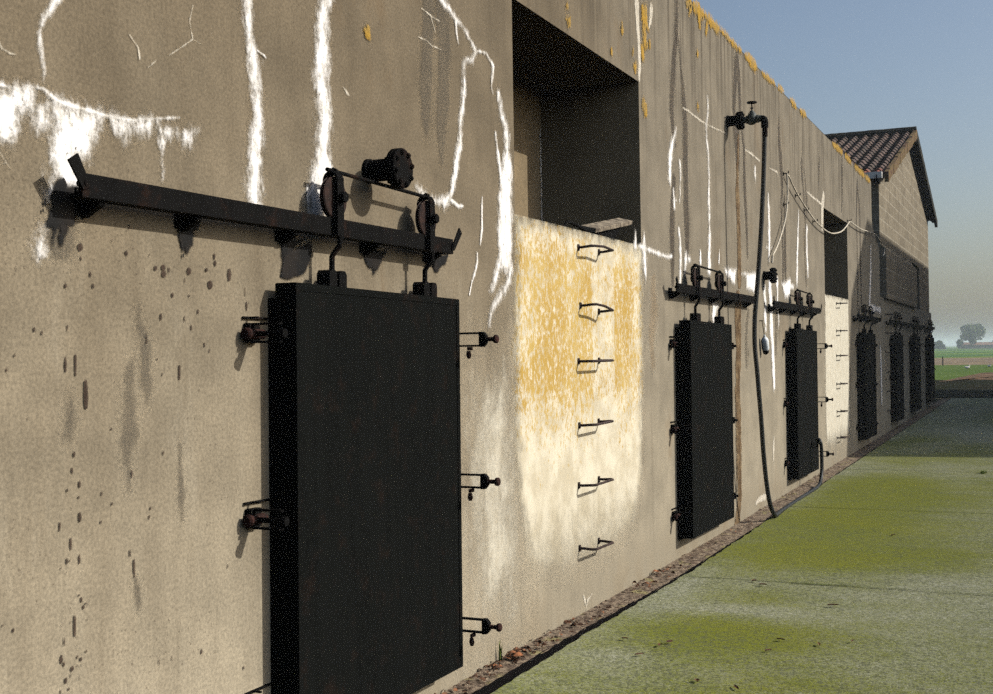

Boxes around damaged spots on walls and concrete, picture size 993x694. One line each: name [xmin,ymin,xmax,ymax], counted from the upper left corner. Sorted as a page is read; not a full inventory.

damp [0,83,174,187]
damp [244,0,266,204]
damp [307,0,332,216]
damp [490,91,513,316]
damp [64,354,88,409]
damp [60,594,87,694]